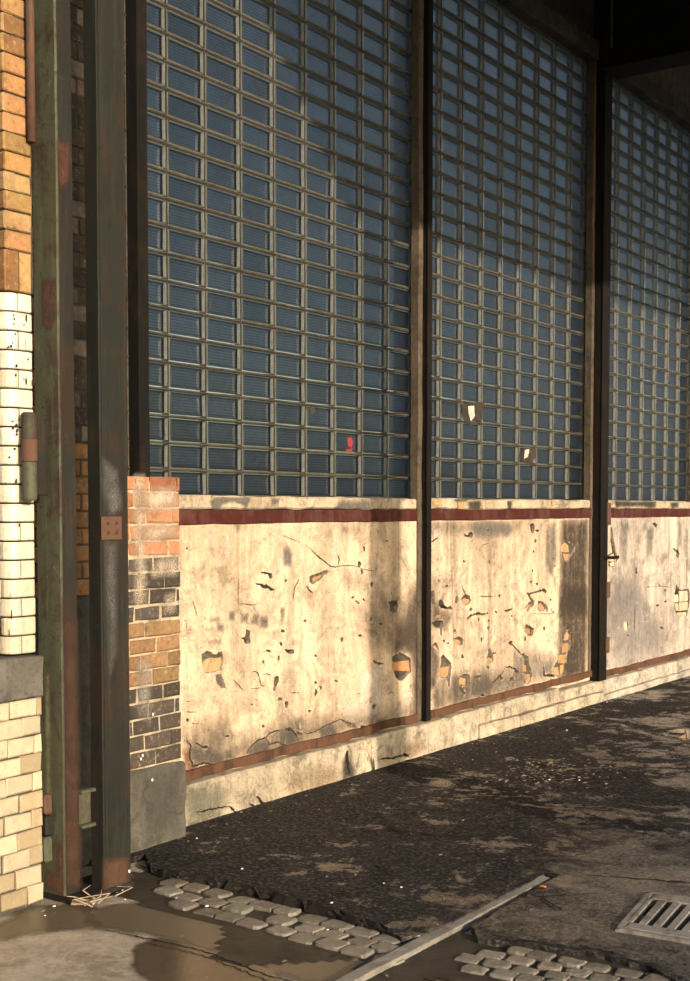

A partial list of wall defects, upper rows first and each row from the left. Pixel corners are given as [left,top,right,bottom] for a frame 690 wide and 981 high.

crack [285,536,377,586]
damp [547,521,587,676]
flaking render [648,584,690,617]
flaking render [201,651,226,688]
flaking render [344,652,411,726]
flaking render [431,569,555,699]
flaking render [498,630,570,690]